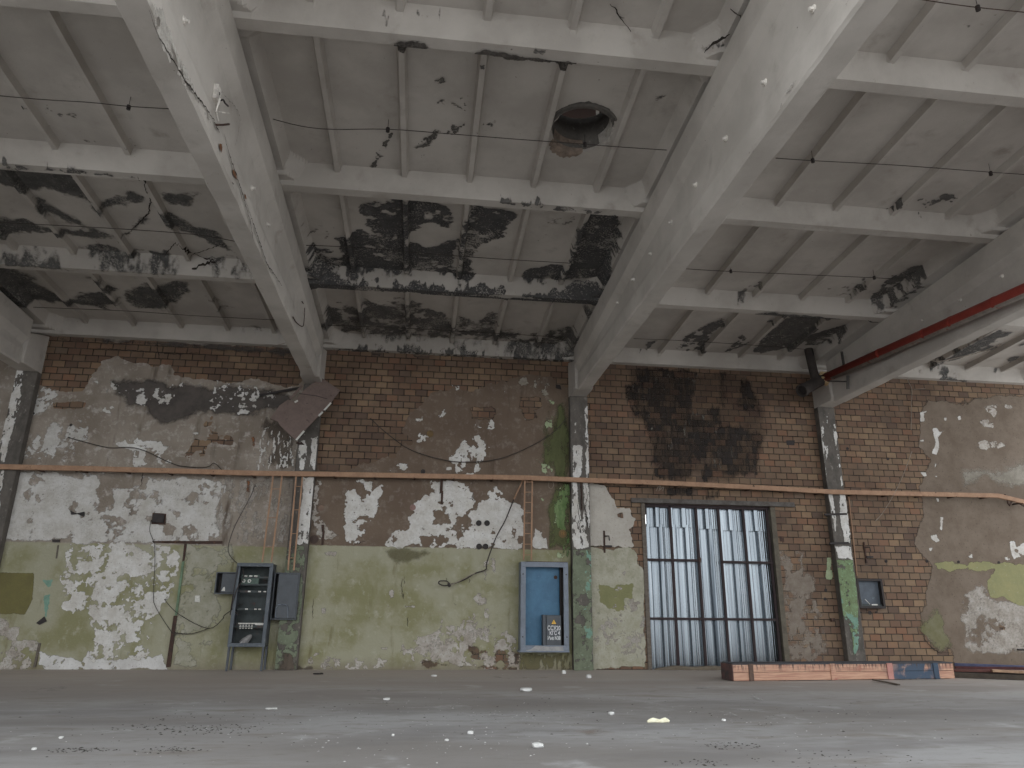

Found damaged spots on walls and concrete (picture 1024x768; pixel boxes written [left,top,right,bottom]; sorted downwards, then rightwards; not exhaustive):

water stain [0,157,189,310]
crack [121,178,152,238]
water stain [159,193,250,279]
crack [149,10,282,286]
water stain [304,199,622,362]
water stain [725,312,847,353]
water stain [828,265,927,310]
peeling [0,336,570,670]
peeling [385,406,646,670]
peeling [779,416,859,661]
peeling [920,411,961,477]
peeling [926,517,1024,654]